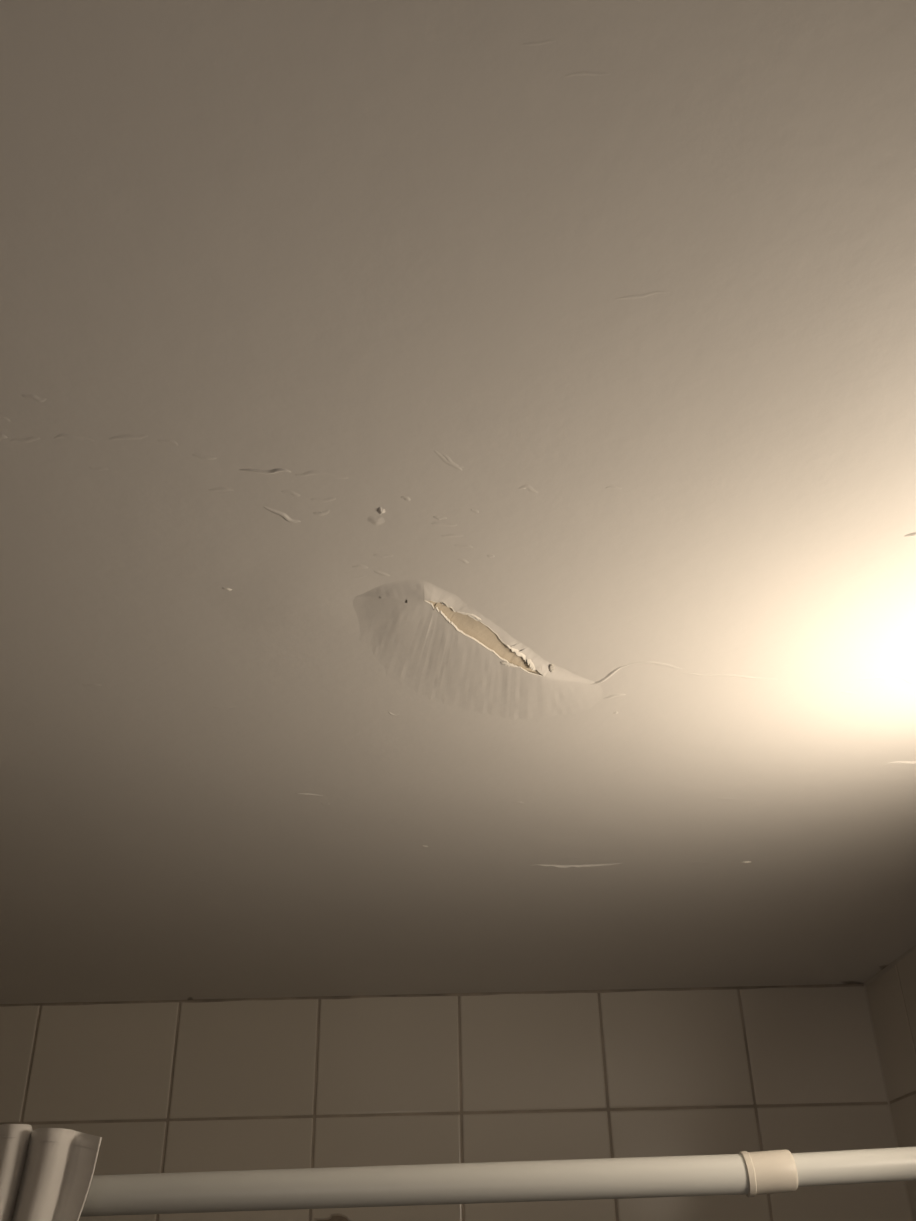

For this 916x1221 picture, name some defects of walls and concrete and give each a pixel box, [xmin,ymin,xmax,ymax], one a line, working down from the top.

peeling [502,644,535,671]